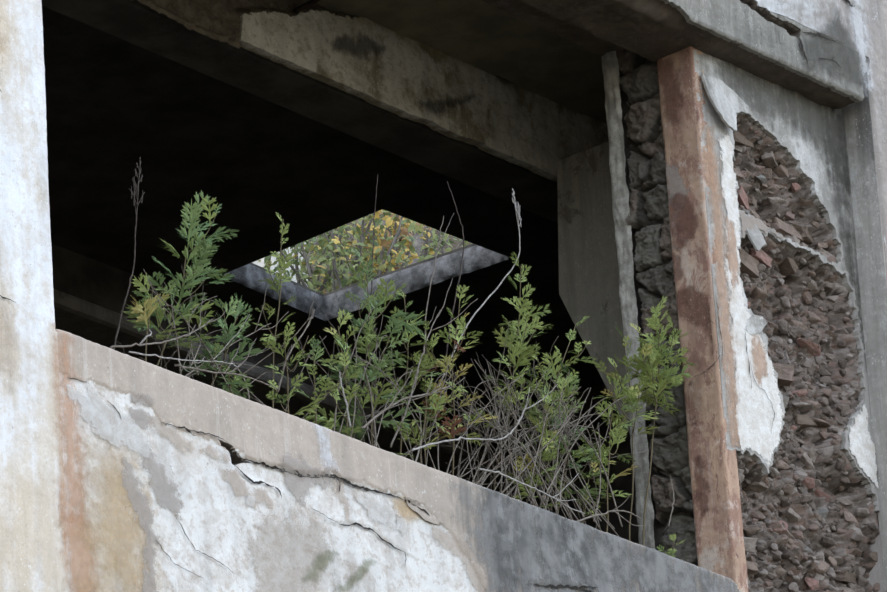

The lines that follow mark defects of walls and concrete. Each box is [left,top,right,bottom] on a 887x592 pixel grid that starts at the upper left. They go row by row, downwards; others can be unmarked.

corrosion [704,129,740,447]
corrosion [752,339,767,383]
spalling [718,114,880,592]
peeling [129,394,155,429]
crack [162,422,430,516]
peeling [122,450,184,592]
crack [157,515,231,577]
crack [311,508,406,562]